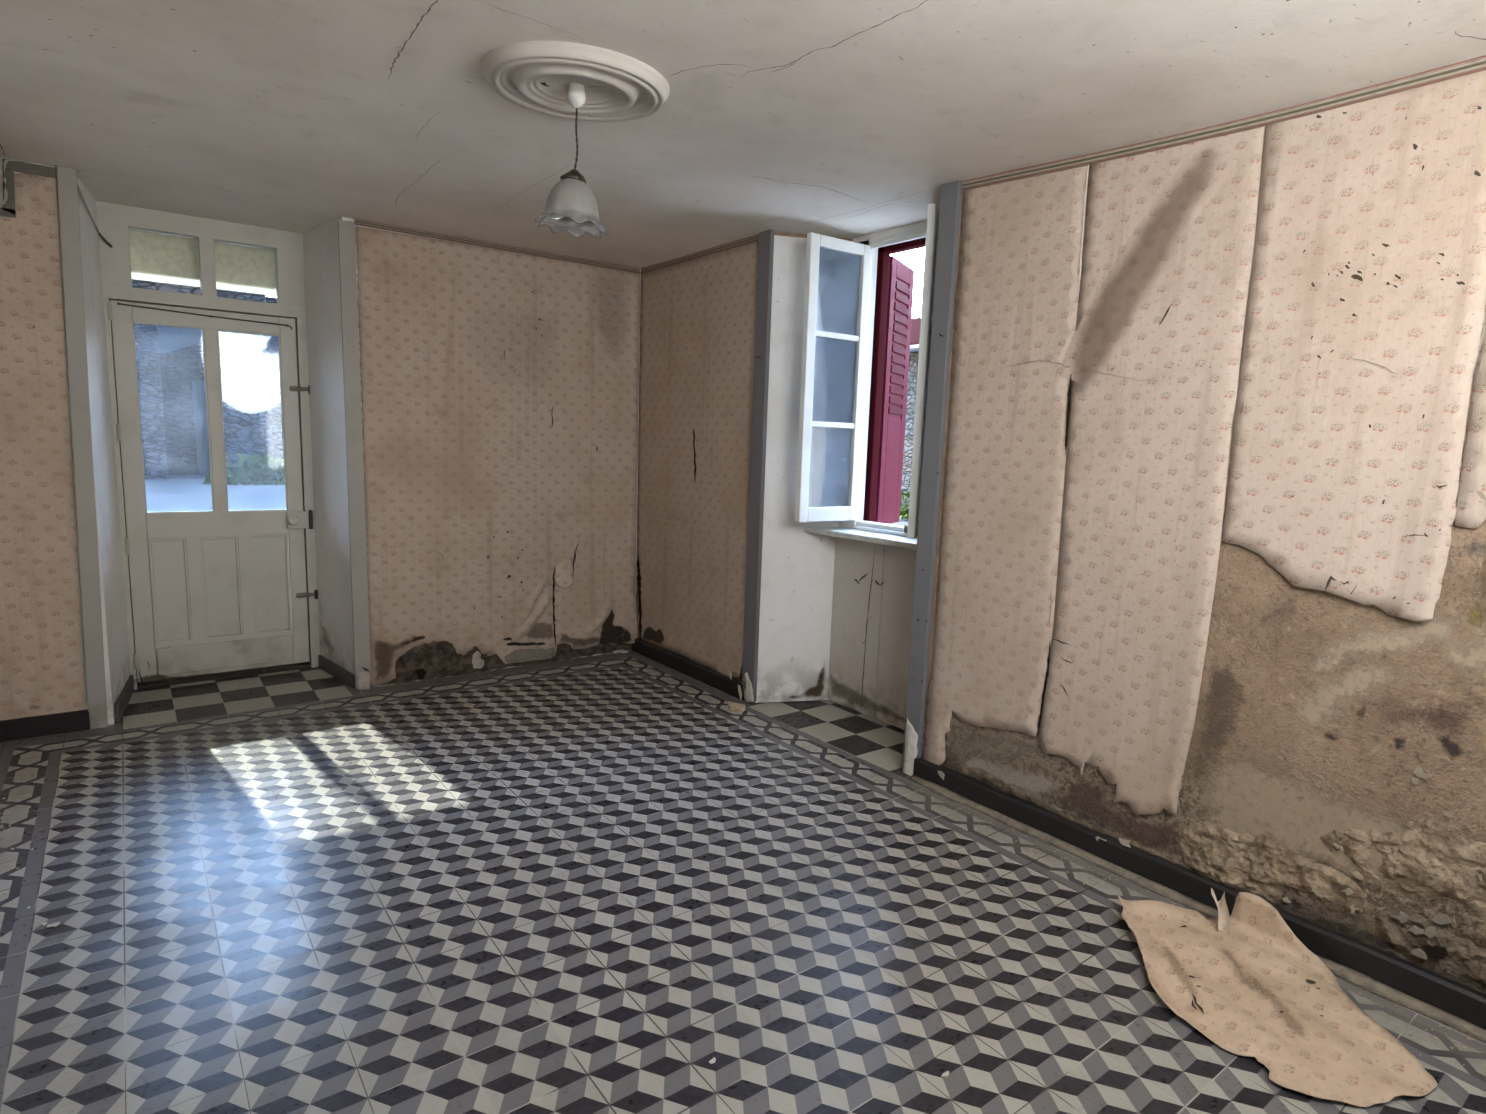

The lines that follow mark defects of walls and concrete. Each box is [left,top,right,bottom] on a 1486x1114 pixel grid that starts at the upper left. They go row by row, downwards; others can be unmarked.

crack [388,0,438,81]
crack [671,0,927,79]
water stain [1080,175,1201,378]
spalling [357,641,631,690]
spalling [938,762,1486,985]